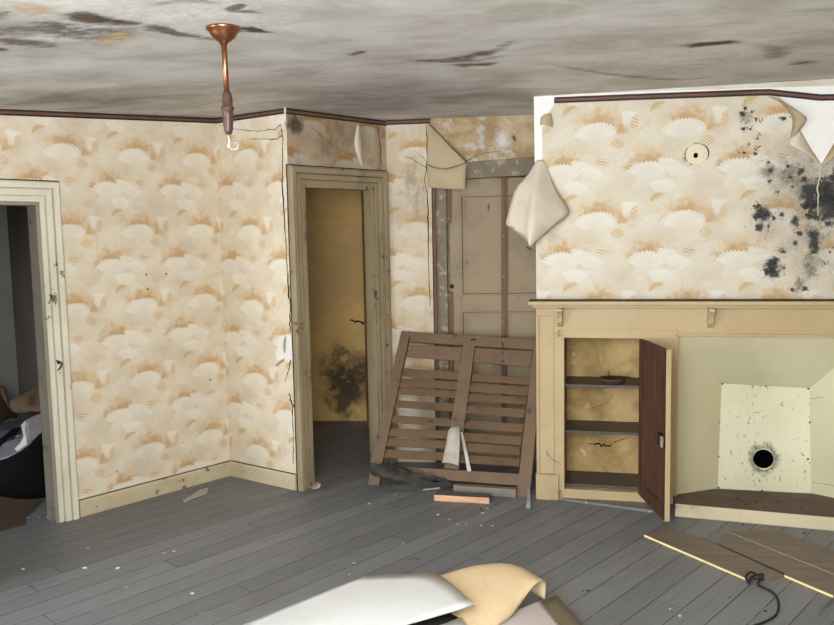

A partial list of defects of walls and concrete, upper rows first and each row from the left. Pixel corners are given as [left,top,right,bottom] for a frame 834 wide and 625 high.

leakage [0,13,135,51]
leakage [147,26,210,39]
leakage [423,51,494,67]
peeling [534,85,834,166]
crack [220,124,291,334]
leakage [738,100,834,294]
crack [285,360,294,464]